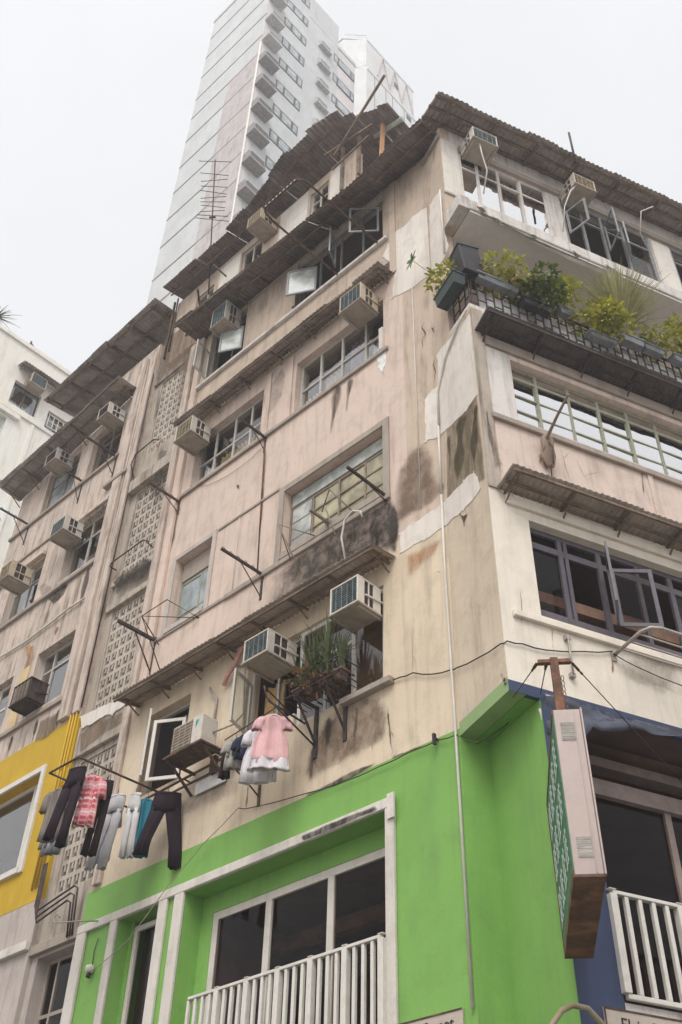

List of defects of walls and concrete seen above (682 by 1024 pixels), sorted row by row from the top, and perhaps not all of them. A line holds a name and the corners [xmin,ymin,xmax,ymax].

water stain [447,406,500,476]
water stain [277,449,436,598]
water stain [308,699,390,777]